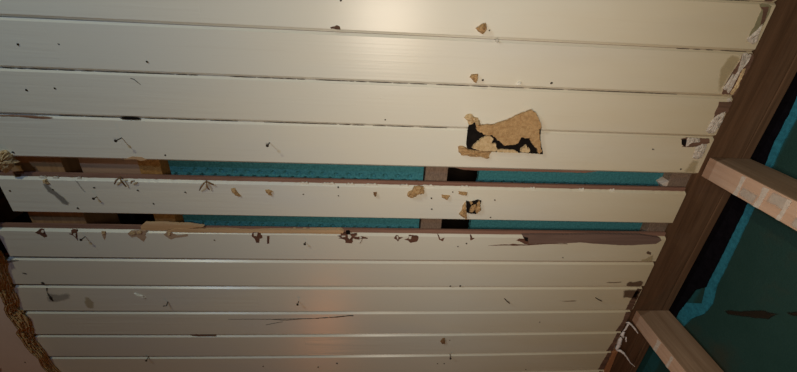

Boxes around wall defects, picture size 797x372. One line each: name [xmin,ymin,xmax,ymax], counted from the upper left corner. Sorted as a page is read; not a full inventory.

peeling [681,0,774,159]